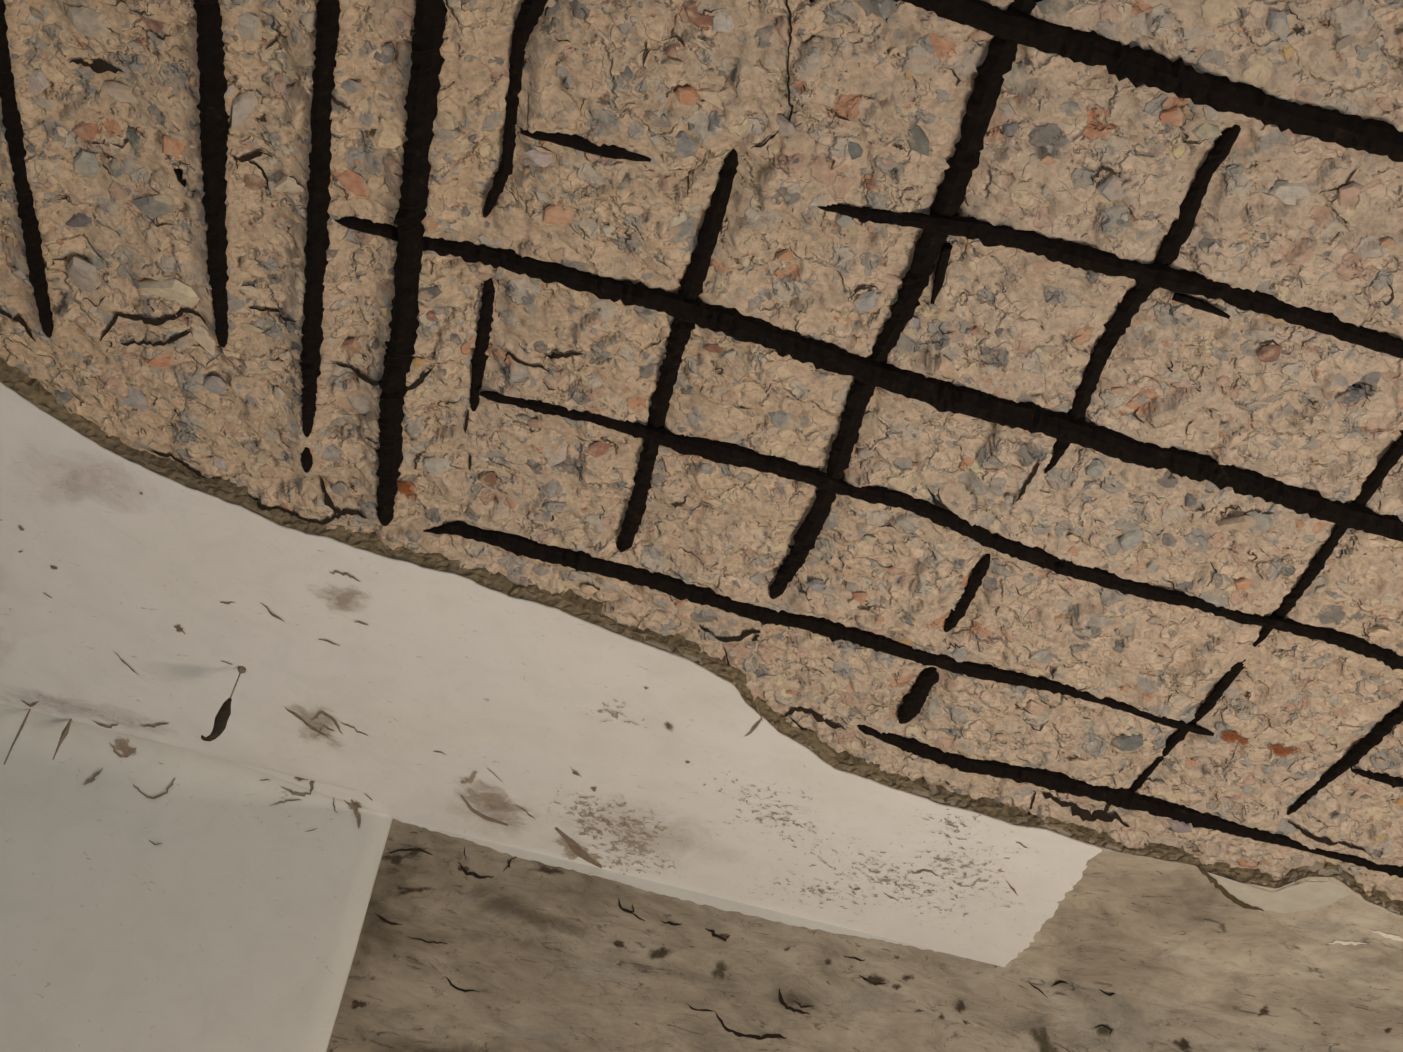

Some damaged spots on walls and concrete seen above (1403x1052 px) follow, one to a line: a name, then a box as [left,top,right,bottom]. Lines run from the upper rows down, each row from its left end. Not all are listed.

crack [69,58,123,74]
spalling [0,0,54,338]
crack [100,310,211,347]
spalling [299,0,341,437]
spalling [375,0,1403,552]
crack [248,477,372,525]
spalling [480,318,1403,670]
spalling [423,521,1214,736]
crack [782,707,845,731]
crack [1028,792,1130,827]
spalling [857,724,1403,878]
crack [1288,821,1370,856]